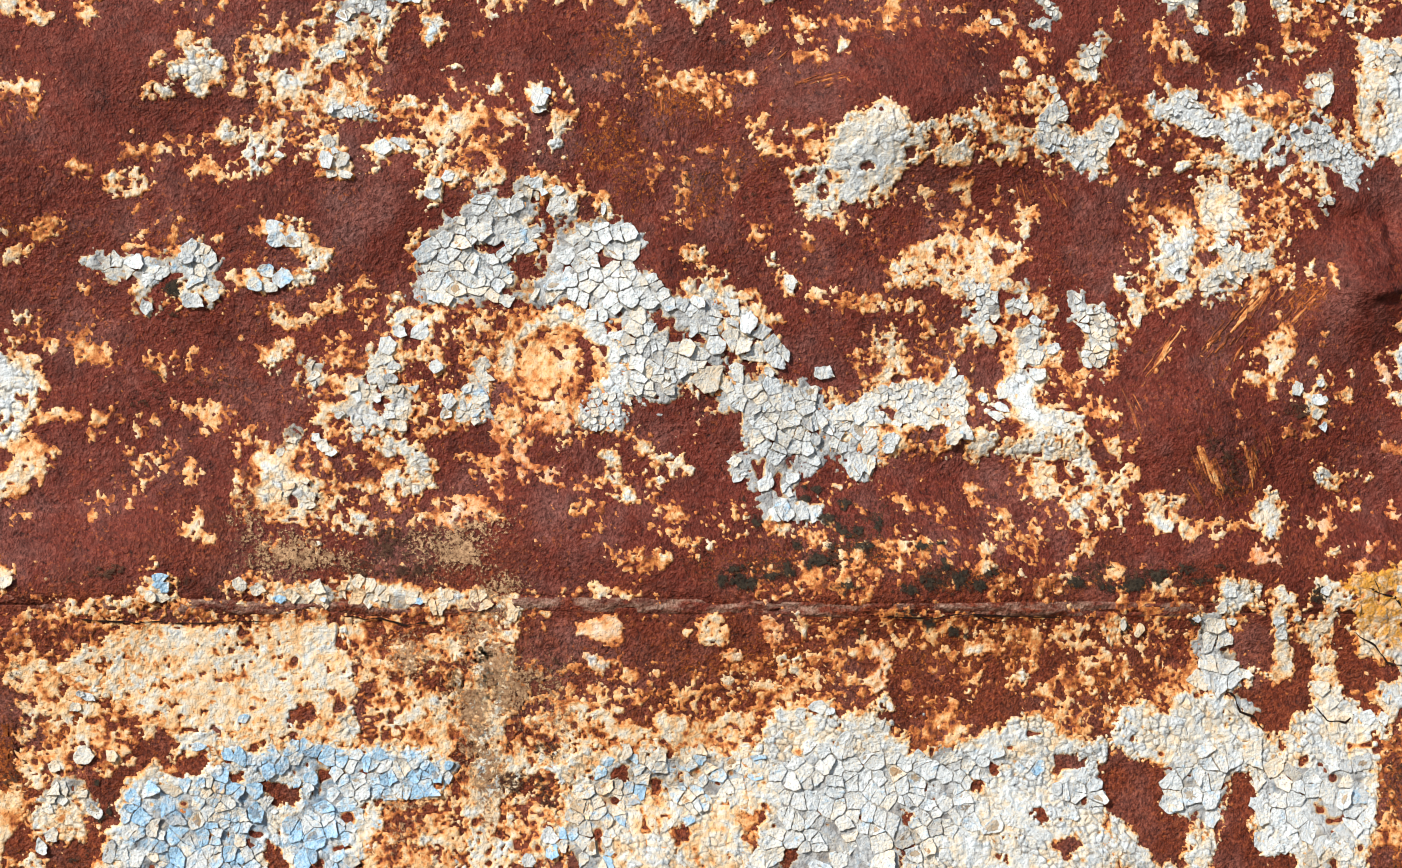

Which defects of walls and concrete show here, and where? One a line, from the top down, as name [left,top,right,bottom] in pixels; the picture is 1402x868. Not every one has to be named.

peeling [0,0,104,30]
peeling [62,156,155,199]
corrosion [472,0,827,270]
peeling [78,0,1402,555]
corrosion [783,0,1064,107]
corrosion [804,170,1054,323]
peeling [0,309,89,508]
corrosion [80,338,259,545]
peeling [0,462,1402,868]
corrosion [338,396,1217,787]
crack [1228,692,1263,730]
crack [1316,707,1354,724]